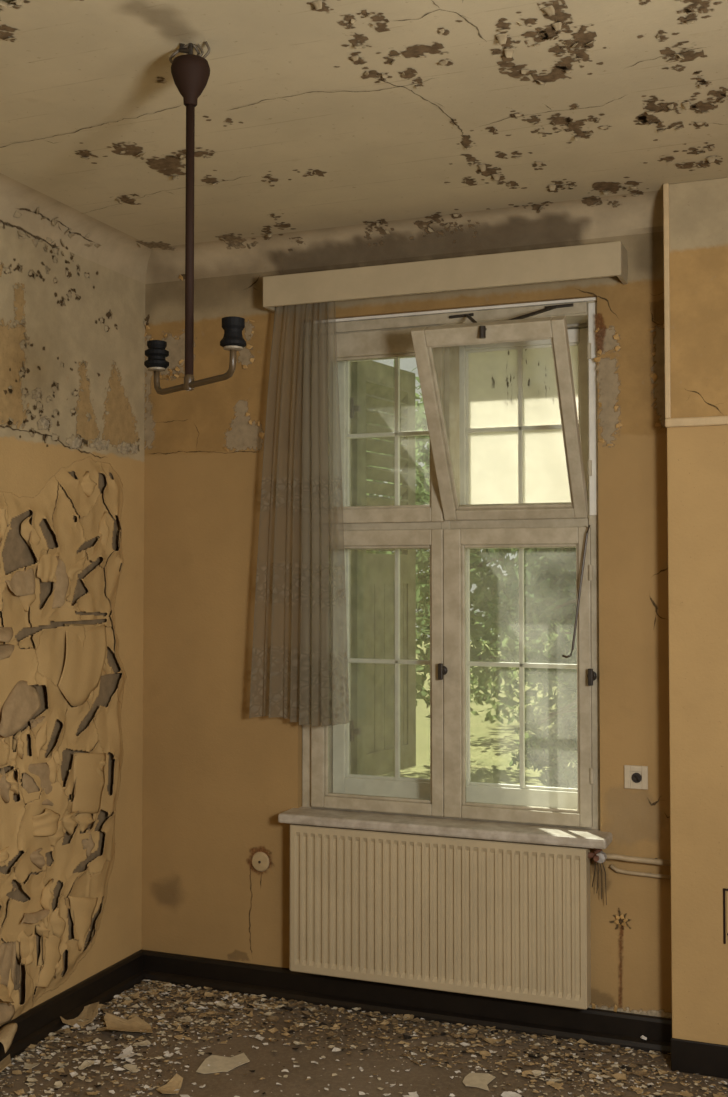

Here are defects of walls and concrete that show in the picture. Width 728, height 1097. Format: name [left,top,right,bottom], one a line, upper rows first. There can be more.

peeling [0,0,30,42]
peeling [307,0,462,89]
crack [398,3,486,41]
peeling [490,0,606,85]
peeling [634,0,728,141]
peeling [75,142,214,180]
peeling [444,119,547,189]
peeling [510,104,611,143]
peeling [644,142,723,171]
peeling [115,194,140,205]
peeling [648,324,667,430]
peeling [0,243,195,1072]